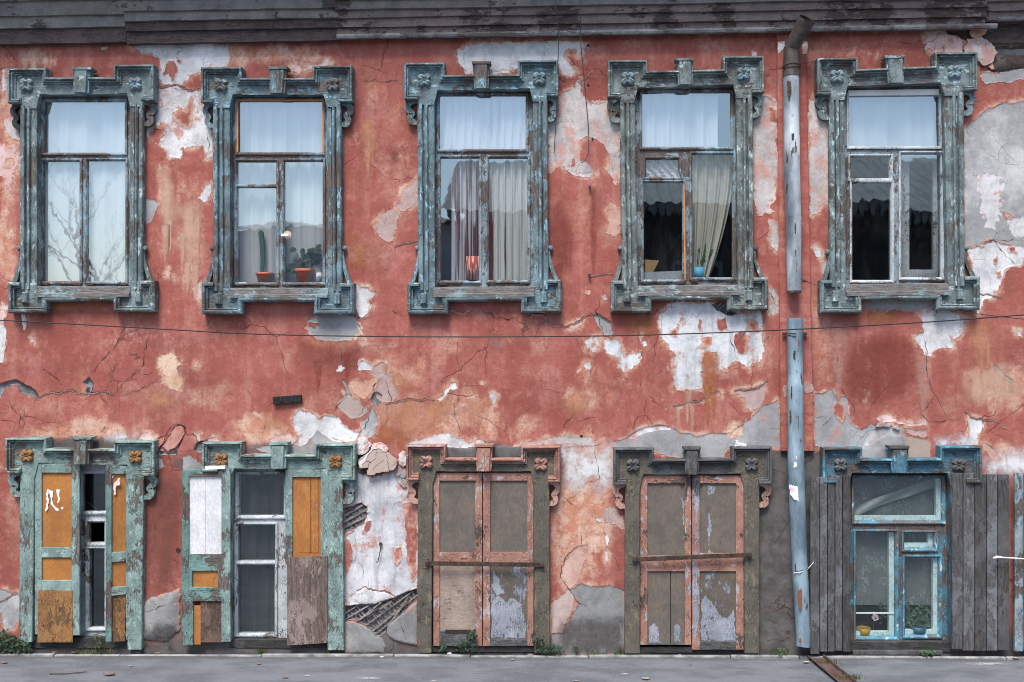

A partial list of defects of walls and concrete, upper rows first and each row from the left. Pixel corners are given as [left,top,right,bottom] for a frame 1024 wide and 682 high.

flaking render [130,44,231,160]
flaking render [456,38,620,185]
flaking render [864,100,1024,356]
crack [10,328,158,434]
crack [309,342,483,484]
flaking render [657,287,779,411]
flaking render [804,380,930,457]
crack [921,334,1022,445]
flaking render [344,454,418,637]
flaking render [550,545,624,657]